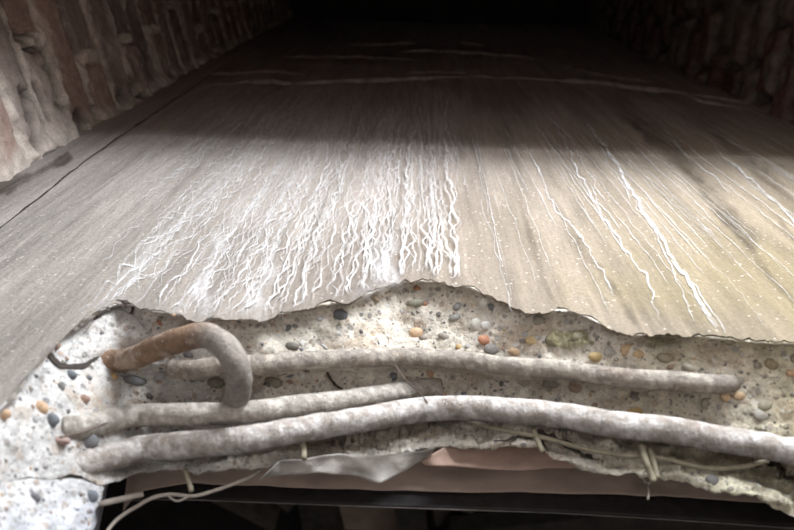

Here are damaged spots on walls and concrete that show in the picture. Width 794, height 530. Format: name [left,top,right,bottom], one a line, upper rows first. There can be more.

water stain [104,86,460,314]
crack [0,41,751,228]
water stain [551,118,631,256]
water stain [587,124,710,314]
crack [43,351,100,368]
crack [326,372,343,390]
spalling [0,279,794,530]